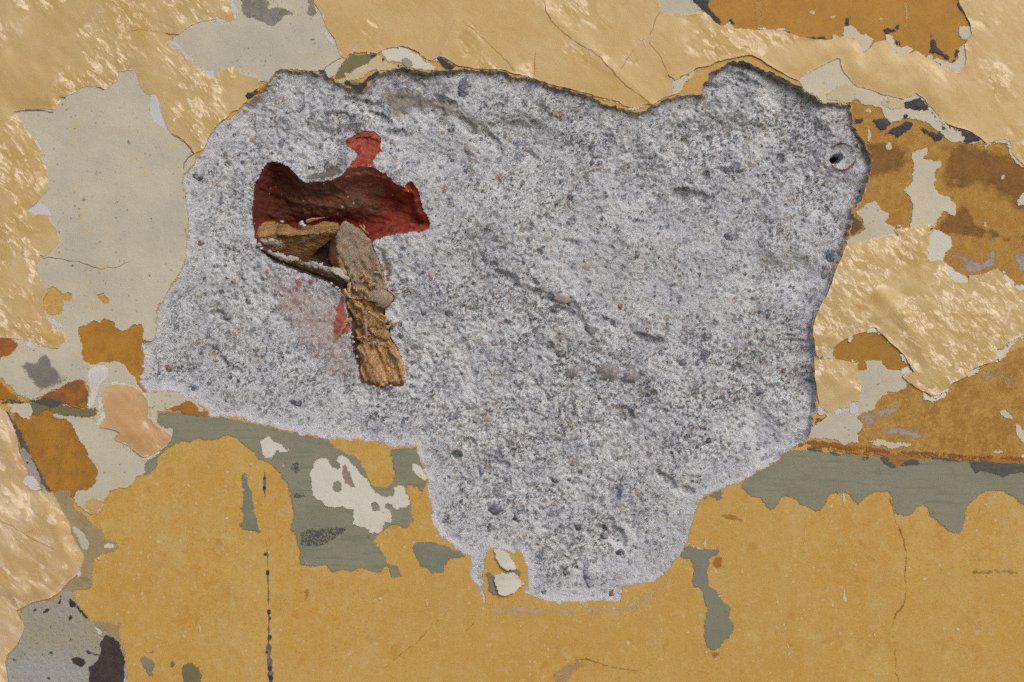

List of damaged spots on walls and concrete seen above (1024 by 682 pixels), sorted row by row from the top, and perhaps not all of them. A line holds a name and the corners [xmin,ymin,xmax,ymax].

peeling [0,397,128,682]
peeling [86,365,172,461]
peeling [0,0,268,348]
spalling [140,0,1024,605]
crack [890,498,907,619]